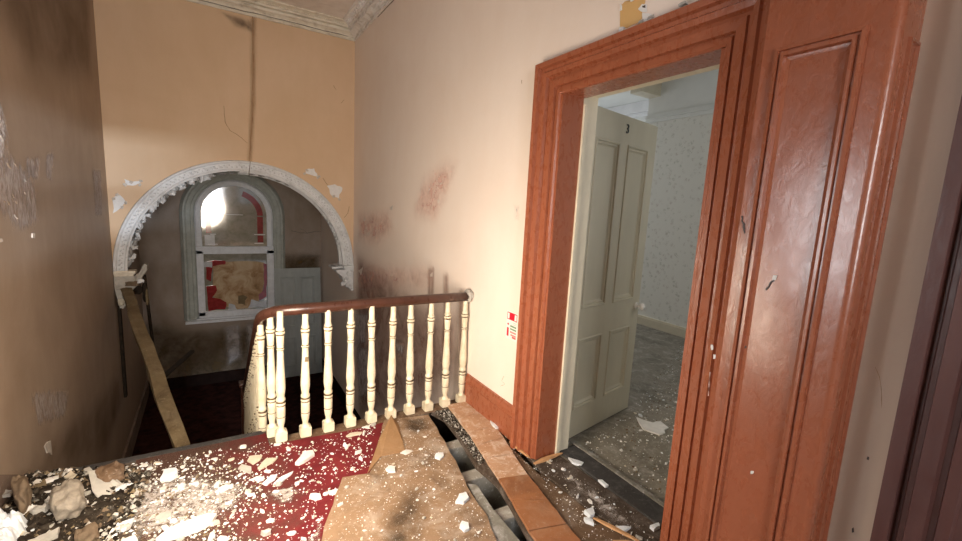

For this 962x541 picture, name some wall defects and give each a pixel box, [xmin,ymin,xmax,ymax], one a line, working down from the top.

crack [201,0,346,55]
peeling [0,105,36,238]
crack [224,81,254,172]
peeling [303,169,342,201]